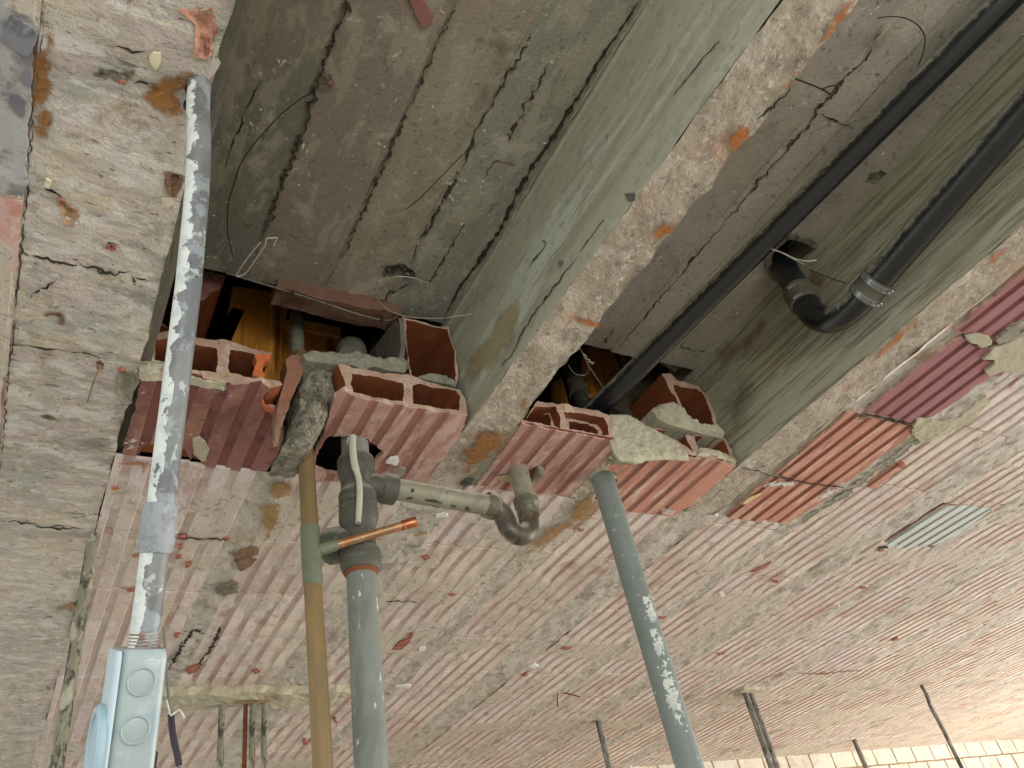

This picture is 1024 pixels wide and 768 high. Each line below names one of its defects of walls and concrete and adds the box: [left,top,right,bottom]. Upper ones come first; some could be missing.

rust [32,34,53,138]
rust [124,72,208,116]
crack [262,1,347,232]
crack [385,2,639,314]
crack [604,25,882,347]
crack [0,29,152,477]
spalling [115,367,140,404]
spalling [251,354,272,378]
rust [463,428,510,473]
spalling [805,441,921,520]
rust [518,494,599,567]
crack [168,626,221,670]